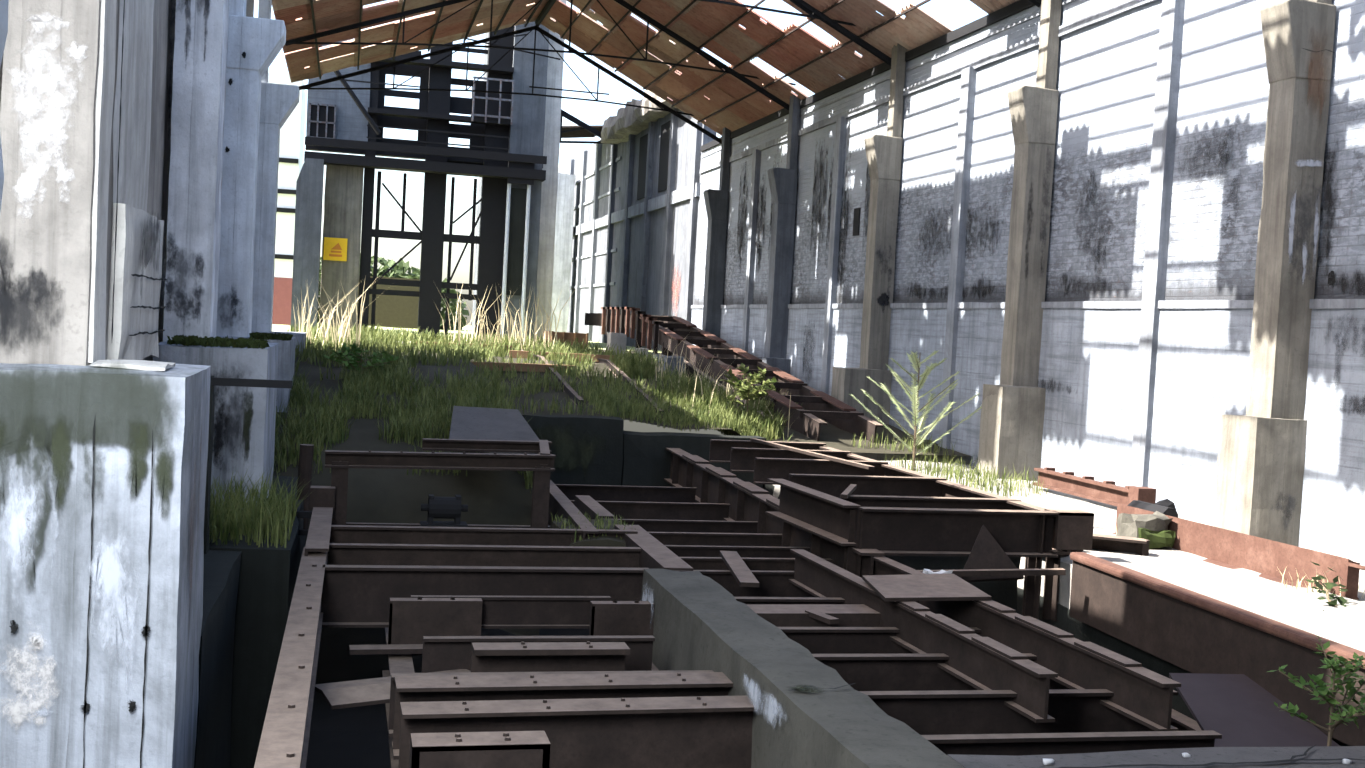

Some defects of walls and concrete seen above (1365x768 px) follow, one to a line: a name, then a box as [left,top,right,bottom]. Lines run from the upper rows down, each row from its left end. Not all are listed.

leakage [167,0,210,130]
leakage [0,243,58,345]
leakage [141,217,203,316]
leakage [796,149,850,304]
leakage [910,276,995,298]
leakage [1079,175,1104,260]
leakage [1317,149,1337,269]
leakage [1336,272,1365,295]
leakage [212,375,253,463]
leakage [0,420,95,587]
leakage [129,424,173,514]